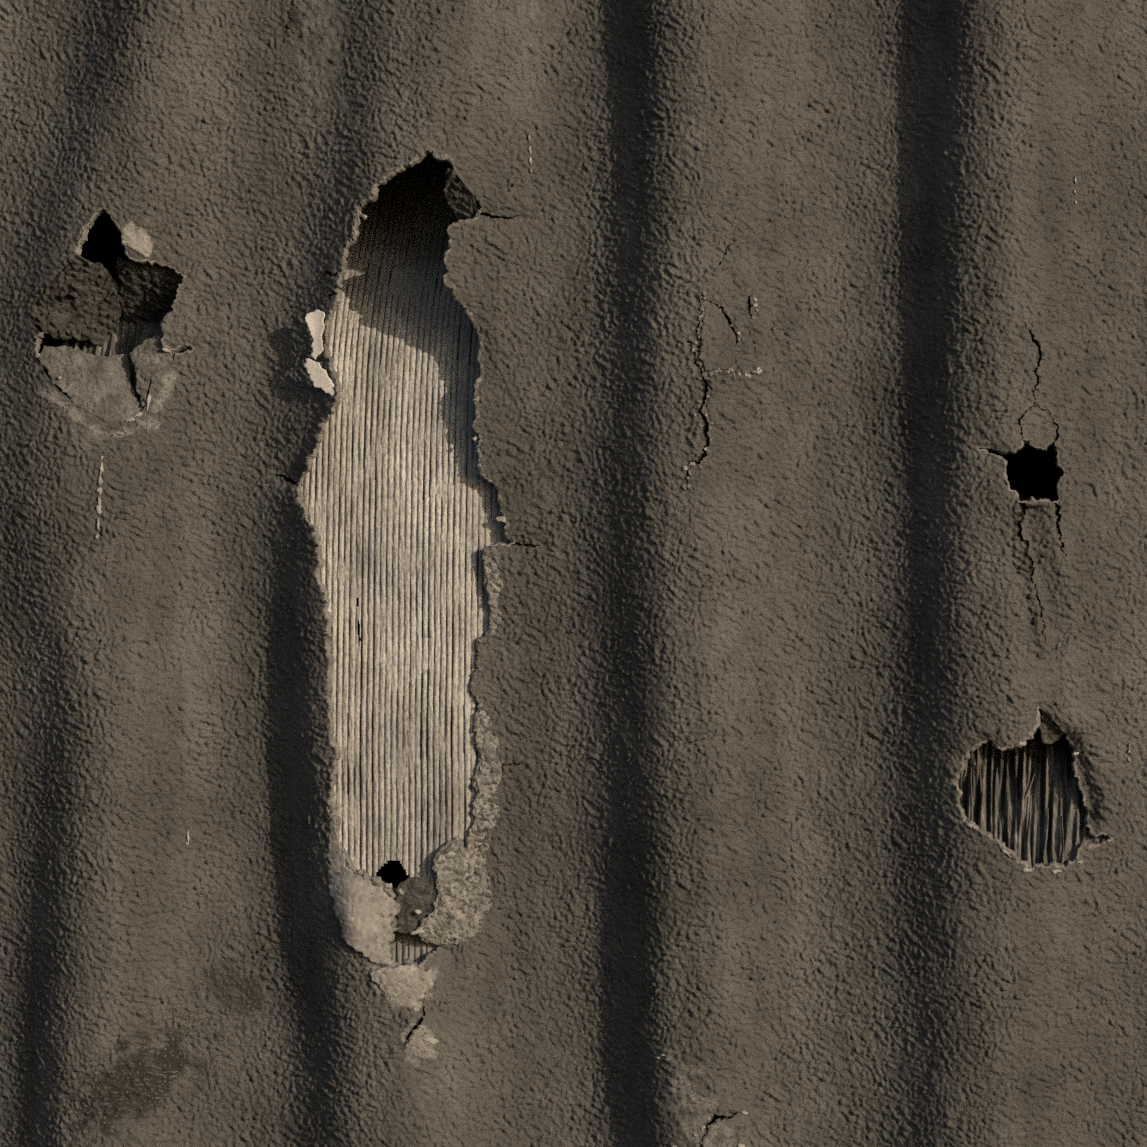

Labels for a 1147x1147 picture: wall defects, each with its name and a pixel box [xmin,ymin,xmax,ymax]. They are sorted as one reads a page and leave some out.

spalling [74,212,130,285]
spalling [33,323,72,401]
peeling [304,310,335,396]
crack [681,242,762,490]
crack [1018,323,1059,441]
spalling [479,547,503,643]
spalling [988,427,1063,577]
crack [1016,498,1047,644]
crack [1055,498,1067,556]
spalling [410,709,502,946]
spalling [326,807,434,1027]
crack [671,1110,748,1147]